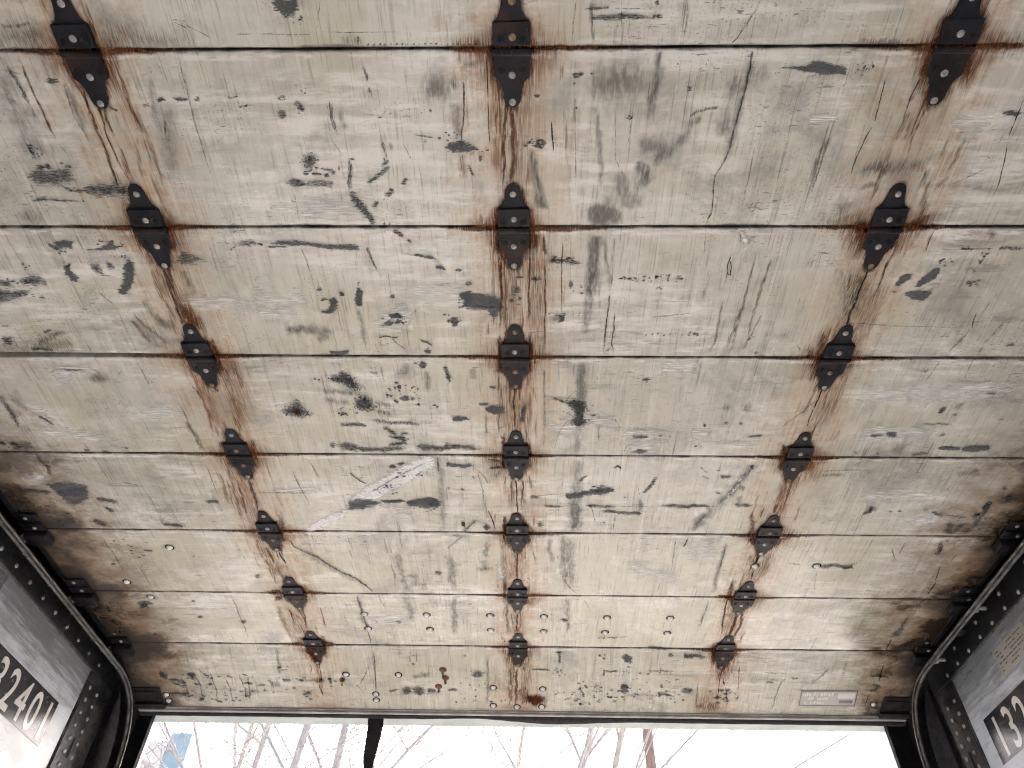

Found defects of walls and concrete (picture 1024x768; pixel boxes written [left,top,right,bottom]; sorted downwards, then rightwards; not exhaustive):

rust [863,0,1024,150]
rust [23,4,342,694]
rust [443,1,615,496]
rust [772,181,963,412]
rust [475,513,577,707]
rust [682,426,850,708]